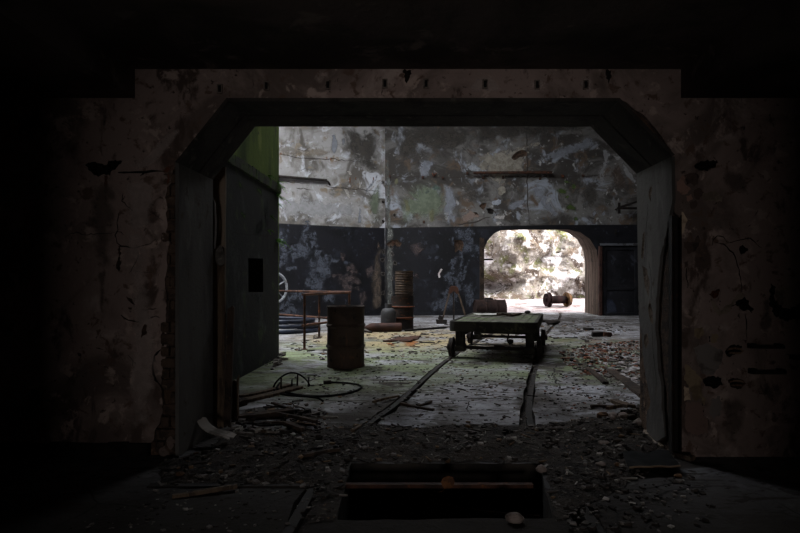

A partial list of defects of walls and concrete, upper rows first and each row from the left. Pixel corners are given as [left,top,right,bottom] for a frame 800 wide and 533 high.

peeling [279,217,426,314]